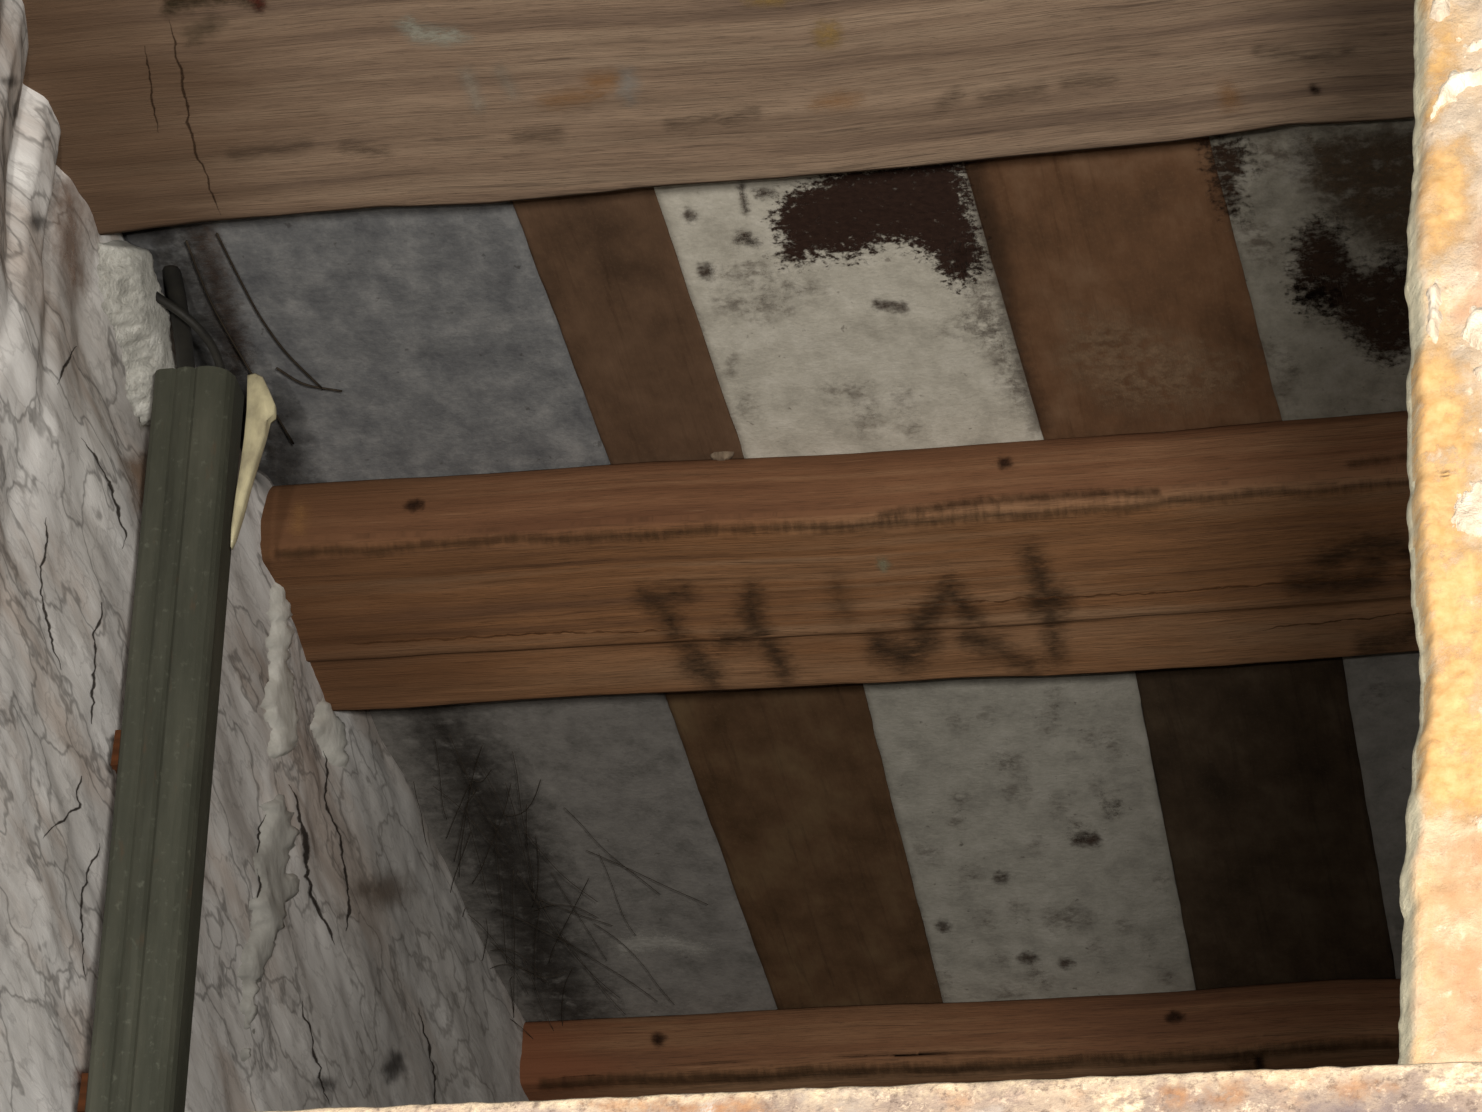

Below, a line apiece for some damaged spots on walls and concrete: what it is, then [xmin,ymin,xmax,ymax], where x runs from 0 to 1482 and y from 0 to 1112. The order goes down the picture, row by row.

water stain [698,265,713,277]
water stain [736,162,1004,362]
water stain [1196,128,1414,375]
water stain [416,708,590,1021]